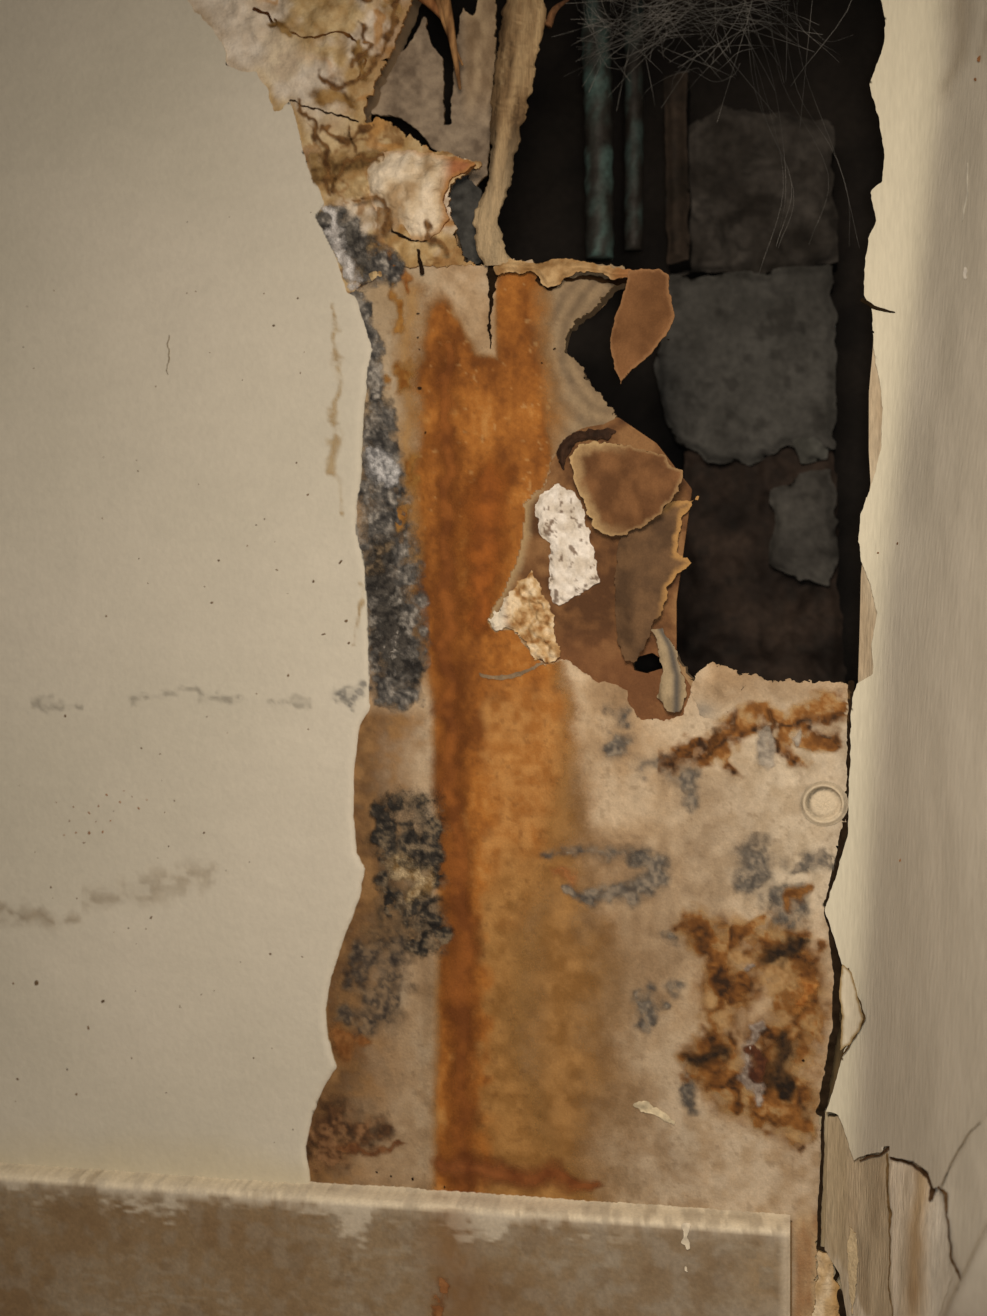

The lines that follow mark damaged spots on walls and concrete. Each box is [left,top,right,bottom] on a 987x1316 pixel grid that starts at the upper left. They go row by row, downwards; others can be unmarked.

crack [252,7,367,78]
crack [289,99,359,122]
spalling [188,0,496,543]
water stain [298,0,429,711]
peeling [490,264,625,645]
peeling [306,586,445,1190]
water stain [330,791,453,1062]
rust [387,250,607,1201]
water stain [640,691,848,808]
peeling [538,564,952,1316]
water stain [668,839,834,1151]
crack [859,1122,980,1316]